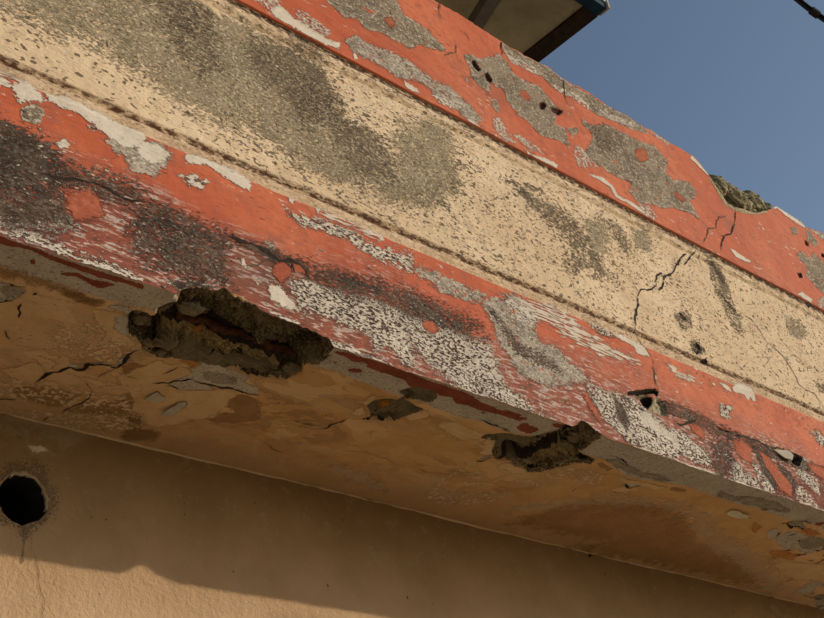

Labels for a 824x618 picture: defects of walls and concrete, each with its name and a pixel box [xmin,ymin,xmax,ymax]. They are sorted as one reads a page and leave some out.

peeling [254,0,700,220]
peeling [0,69,824,556]
crack [630,203,736,334]
crack [36,350,259,421]
water stain [513,495,782,595]